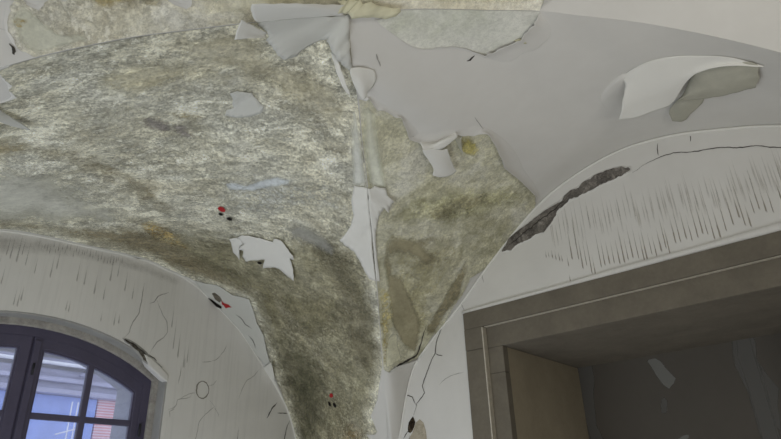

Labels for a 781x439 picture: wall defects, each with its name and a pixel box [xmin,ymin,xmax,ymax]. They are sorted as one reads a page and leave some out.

leakage [70,224,374,439]
flaking render [0,0,552,439]
crack [403,330,442,439]
leakage [381,239,465,359]
flaking render [359,95,631,375]